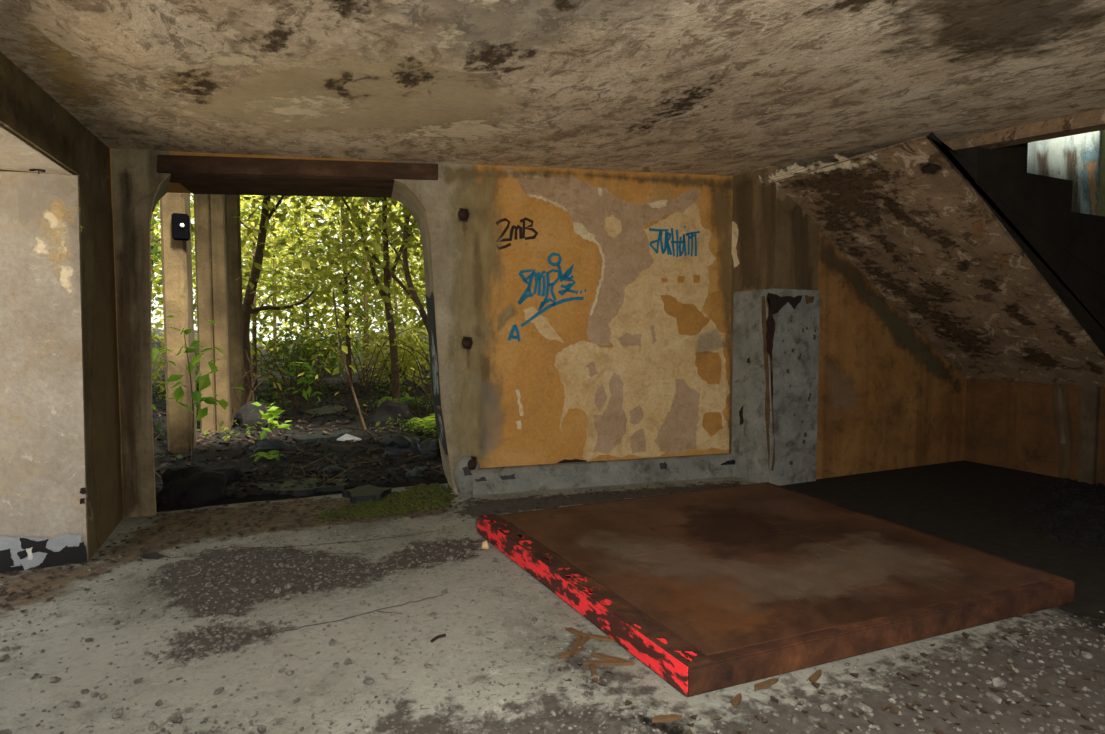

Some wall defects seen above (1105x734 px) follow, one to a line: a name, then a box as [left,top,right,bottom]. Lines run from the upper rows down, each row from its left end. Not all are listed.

water stain [881,0,1105,61]
water stain [1037,153,1049,176]
water stain [1064,149,1099,215]
peeling [501,167,744,469]
water stain [792,205,958,391]
peeling [0,534,87,573]